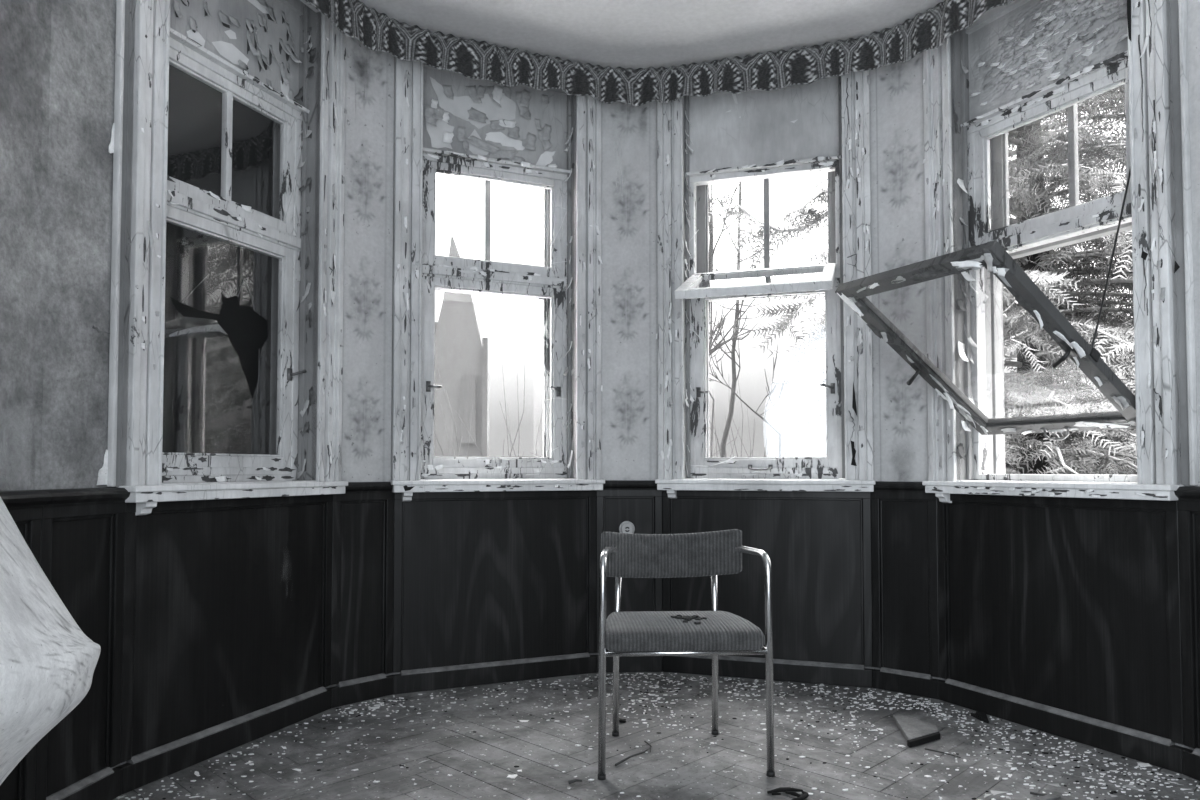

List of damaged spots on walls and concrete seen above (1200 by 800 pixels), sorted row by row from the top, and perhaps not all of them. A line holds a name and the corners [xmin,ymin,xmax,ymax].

peeling [955,29,1152,134]
peeling [174,0,349,343]
peeling [400,77,595,209]
peeling [678,159,797,227]
peeling [812,75,870,254]
peeling [1134,111,1164,212]
peeling [397,201,603,376]
peeling [656,227,727,348]
peeling [1137,233,1165,347]
peeling [141,457,232,502]
peeling [242,379,332,498]
peeling [400,350,603,492]